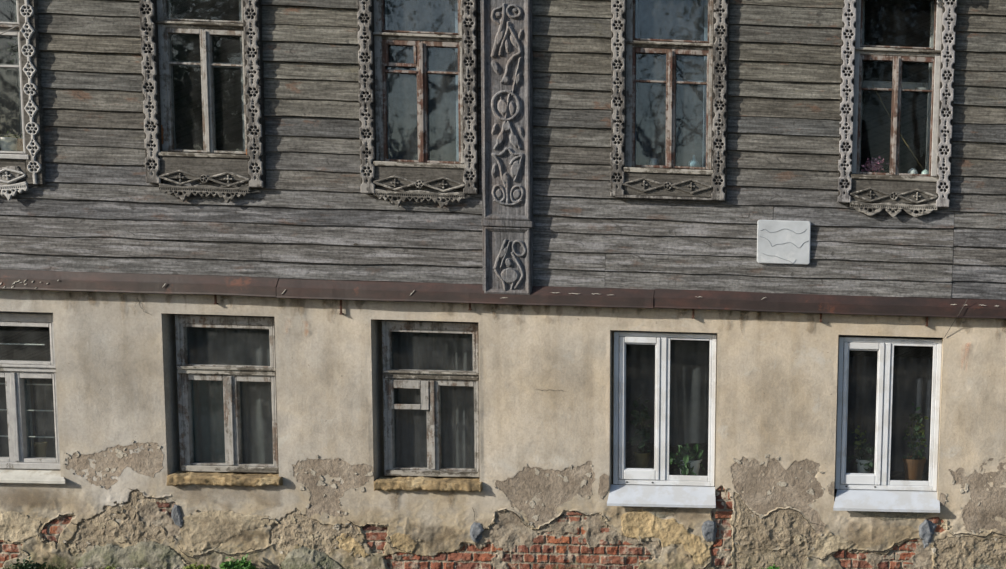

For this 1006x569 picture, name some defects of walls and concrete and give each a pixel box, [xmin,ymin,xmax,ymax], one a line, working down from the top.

peeling [63,440,164,490]
flaking render [0,540,29,568]
flaking render [35,490,180,556]
flaking render [269,455,662,569]
flaking render [642,507,677,518]
flaking render [709,454,834,569]
peeling [833,457,1006,569]